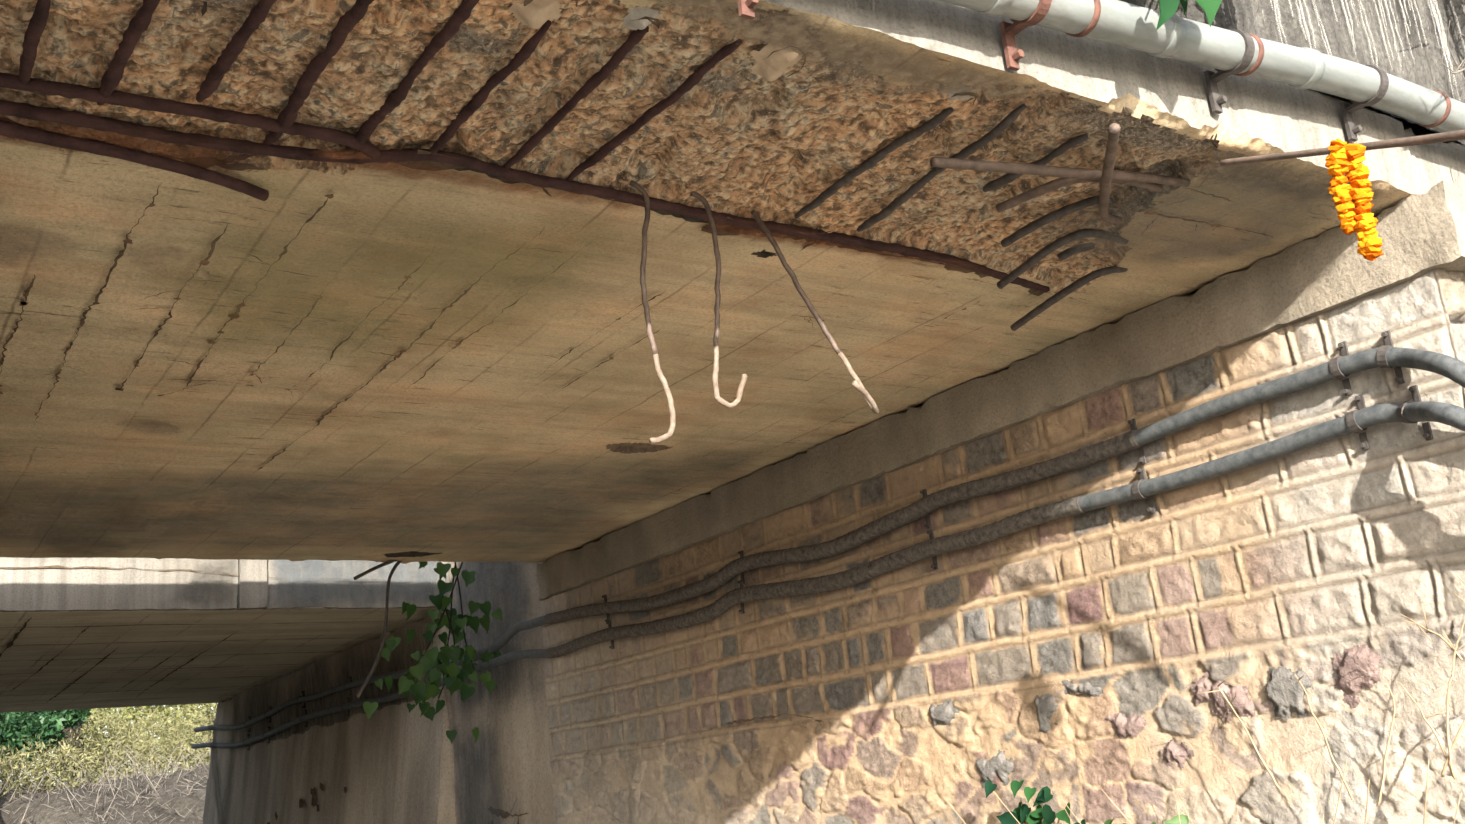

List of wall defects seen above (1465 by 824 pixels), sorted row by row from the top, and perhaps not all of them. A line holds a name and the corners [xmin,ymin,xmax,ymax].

crack [0,117,100,141]
rust [0,128,235,172]
rust [322,149,583,201]
spalling [1358,130,1465,151]
crack [0,274,36,394]
crack [34,149,757,470]
spalling [0,0,1331,454]
rust [707,222,966,269]
crack [791,226,1051,343]
crack [0,618,237,701]